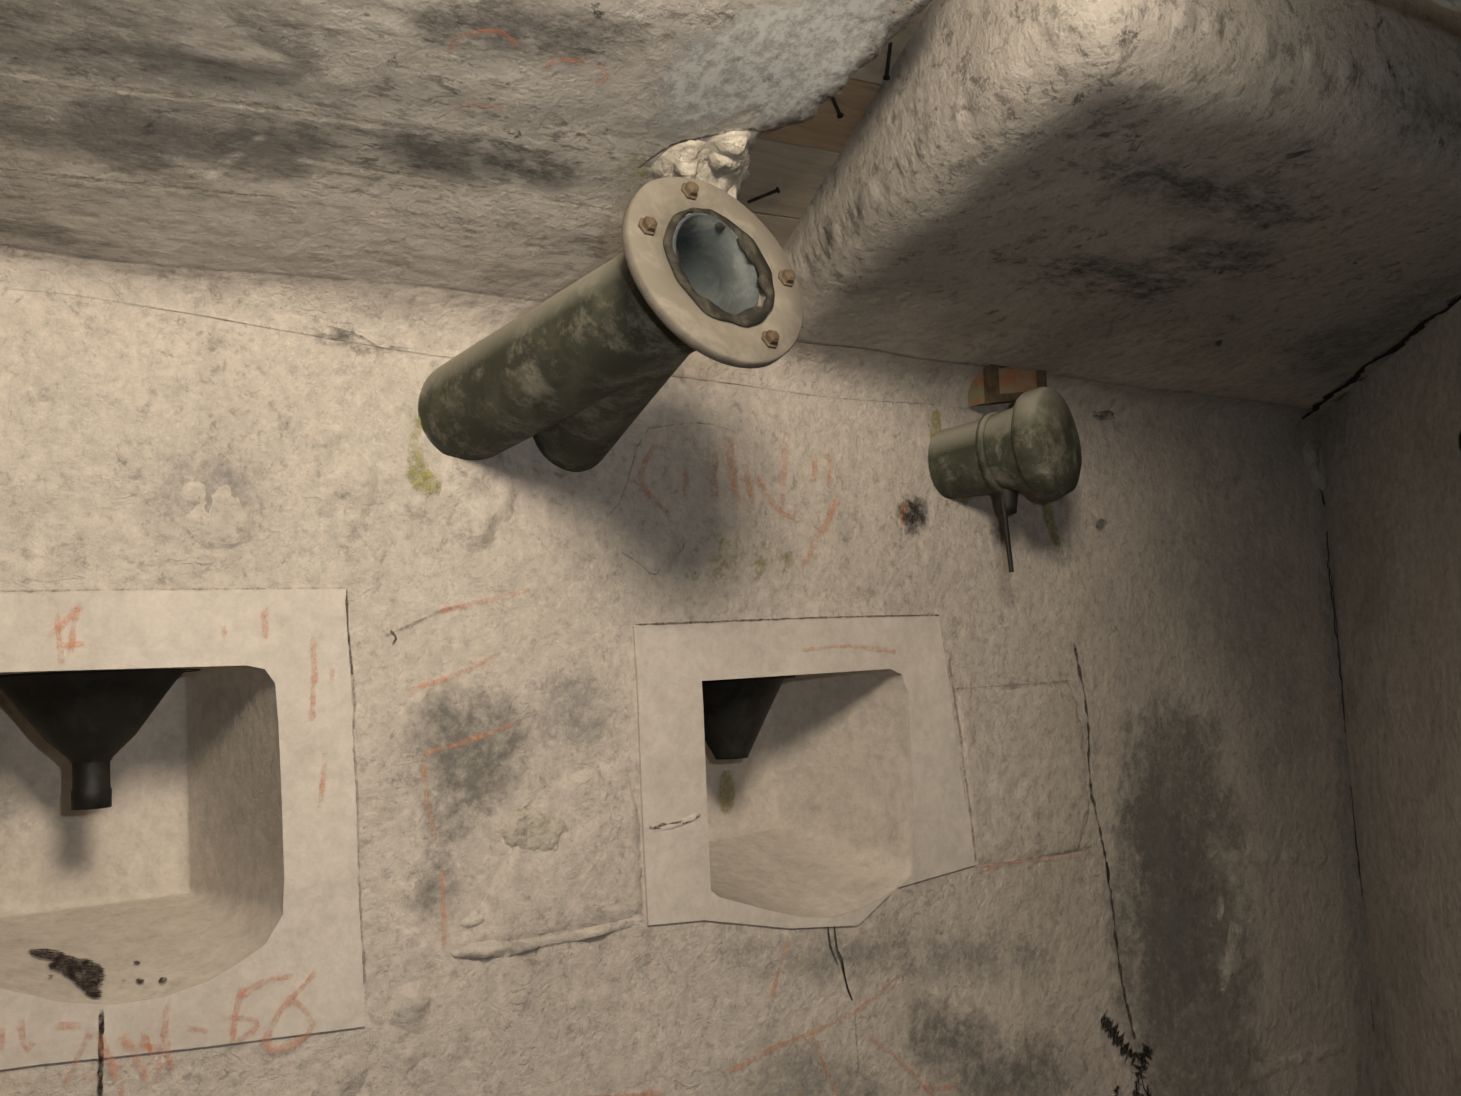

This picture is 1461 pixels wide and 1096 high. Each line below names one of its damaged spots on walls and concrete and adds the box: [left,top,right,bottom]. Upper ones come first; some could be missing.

spalling [651,128,751,200]
water stain [428,703,523,837]
crack [1074,644,1135,1038]
water stain [1101,709,1252,1096]